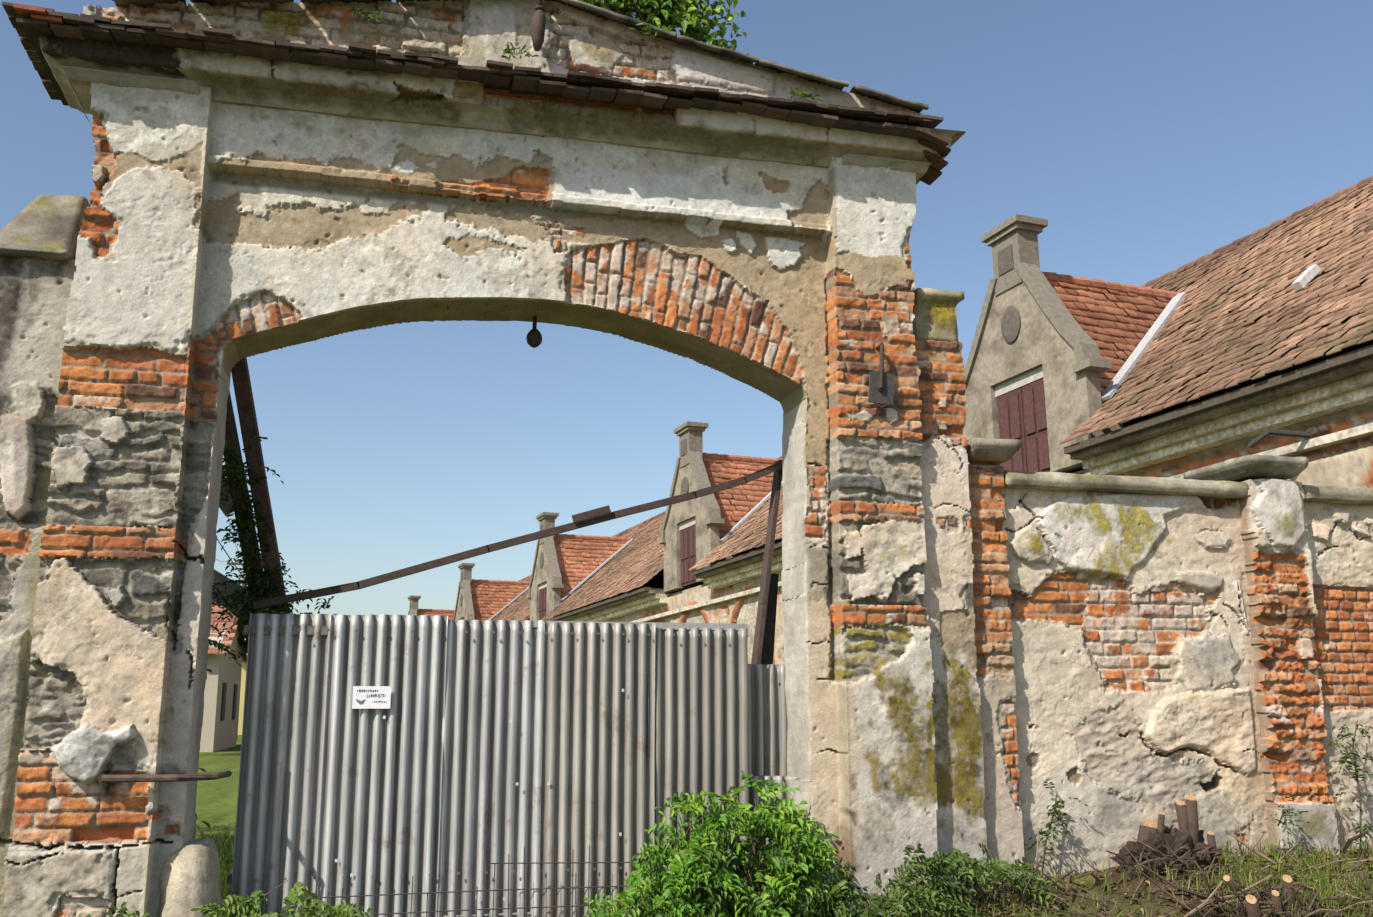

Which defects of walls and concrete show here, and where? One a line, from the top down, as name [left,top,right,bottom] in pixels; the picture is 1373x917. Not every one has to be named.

flaking render [0,289,303,650]
spalling [79,110,1373,825]
spalling [12,658,181,844]
leakage [866,751,889,792]
crack [1119,730,1259,772]
crack [0,837,174,916]